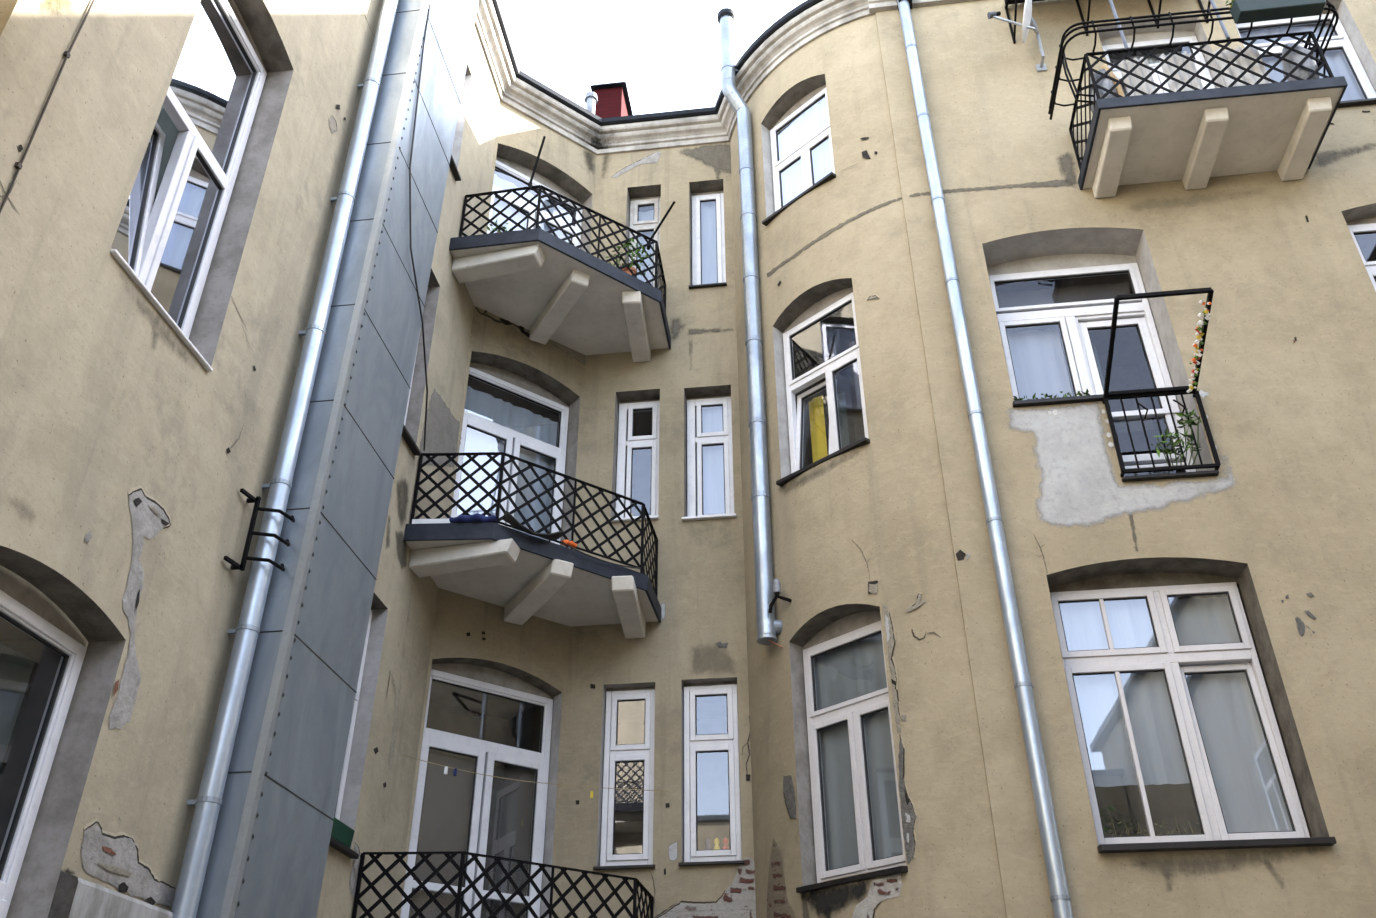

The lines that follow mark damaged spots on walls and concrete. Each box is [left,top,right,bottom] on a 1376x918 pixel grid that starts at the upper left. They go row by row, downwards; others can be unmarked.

flaking render [109,486,172,729]
flaking render [81,818,176,907]
flaking render [656,838,795,918]
flaking render [852,592,941,918]